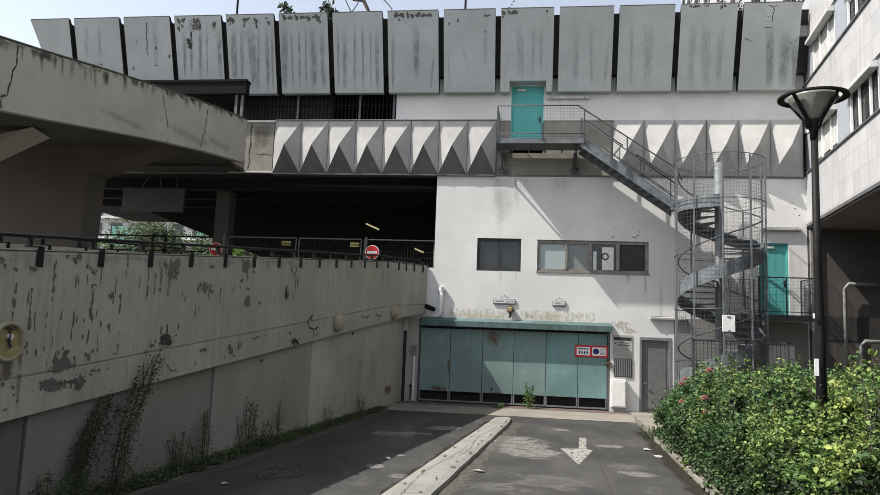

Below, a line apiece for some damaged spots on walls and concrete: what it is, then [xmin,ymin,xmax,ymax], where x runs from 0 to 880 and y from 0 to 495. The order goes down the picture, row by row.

peeling [177,18,201,49]
peeling [226,14,270,28]
peeling [282,11,321,23]
peeling [393,9,432,23]
crack [0,46,19,109]
peeling [108,254,129,314]
peeling [139,258,181,299]
spalling [25,253,111,394]
spalling [150,324,179,360]